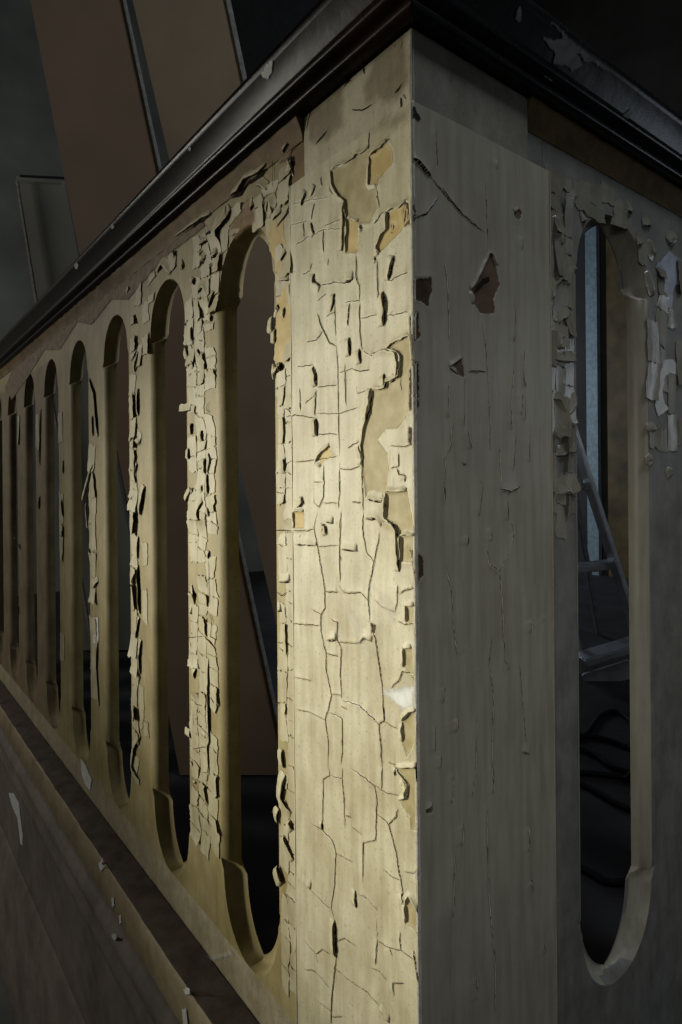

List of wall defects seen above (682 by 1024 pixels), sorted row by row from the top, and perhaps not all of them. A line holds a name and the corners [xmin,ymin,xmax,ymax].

peeling [329,139,409,254]
crack [413,141,488,232]
peeling [469,249,500,314]
peeling [545,162,682,540]
peeling [314,443,332,467]
peeling [358,331,415,562]
peeling [5,142,304,998]
crack [287,178,418,1023]
peeling [402,601,414,623]
crack [444,344,530,793]
peeling [395,706,433,830]
peeling [402,889,418,933]